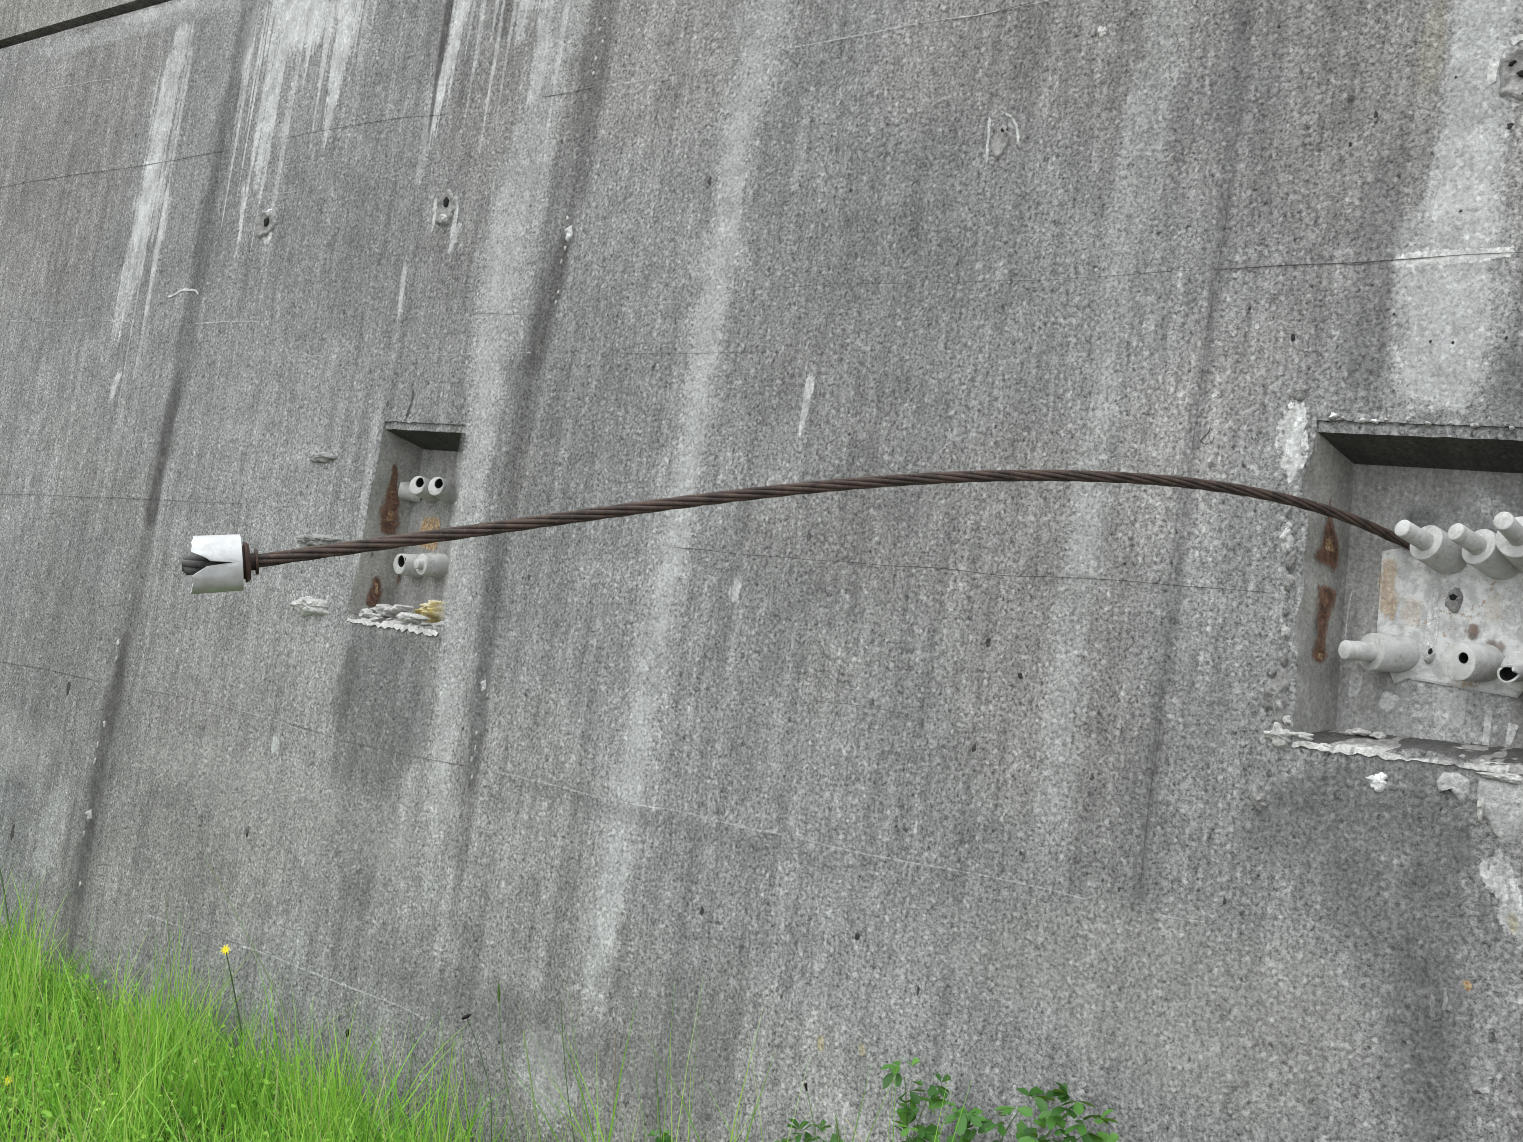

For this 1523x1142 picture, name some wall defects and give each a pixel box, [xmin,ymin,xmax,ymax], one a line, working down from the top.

damp [48,0,374,256]
rust [379,464,400,535]
rust [419,516,440,551]
rust [1312,499,1339,663]
peeling [1476,772,1523,785]